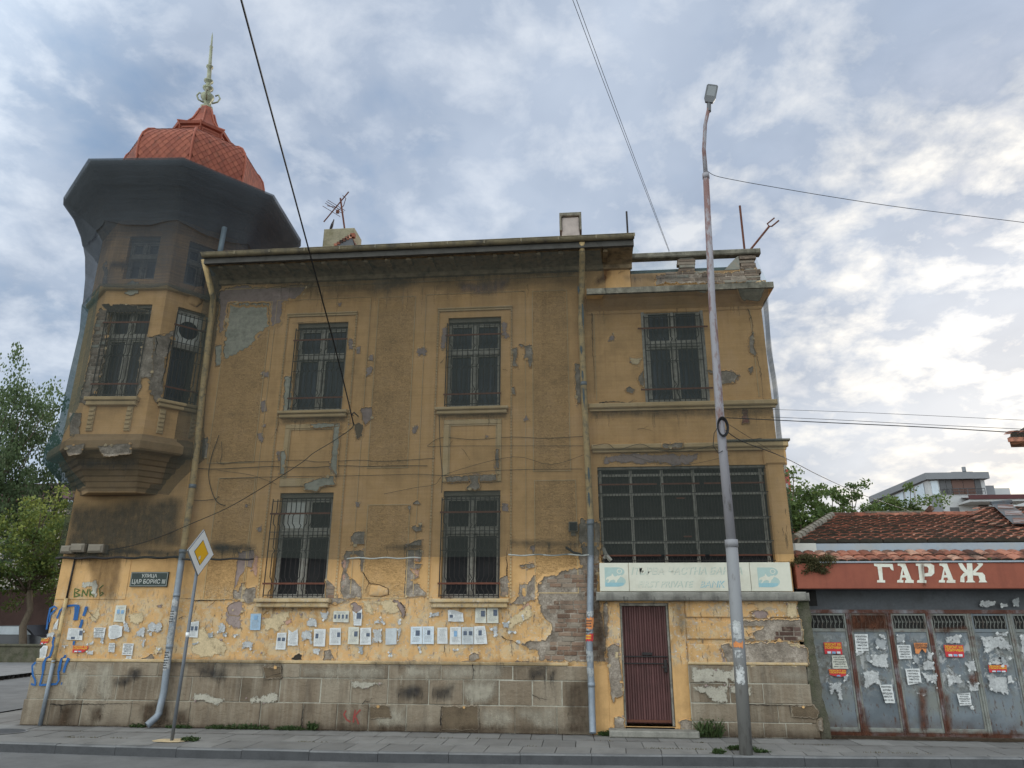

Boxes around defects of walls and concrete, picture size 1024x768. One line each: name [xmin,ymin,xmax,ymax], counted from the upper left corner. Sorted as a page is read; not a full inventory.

flaking render [64,290,148,457]
flaking render [135,330,176,404]
flaking render [200,282,311,367]
flaking render [501,322,534,369]
leakage [68,498,178,557]
flaking render [324,500,427,619]
flaking render [499,468,624,703]
peeling [190,627,228,659]
leakage [403,668,428,697]
flaking render [691,602,810,703]